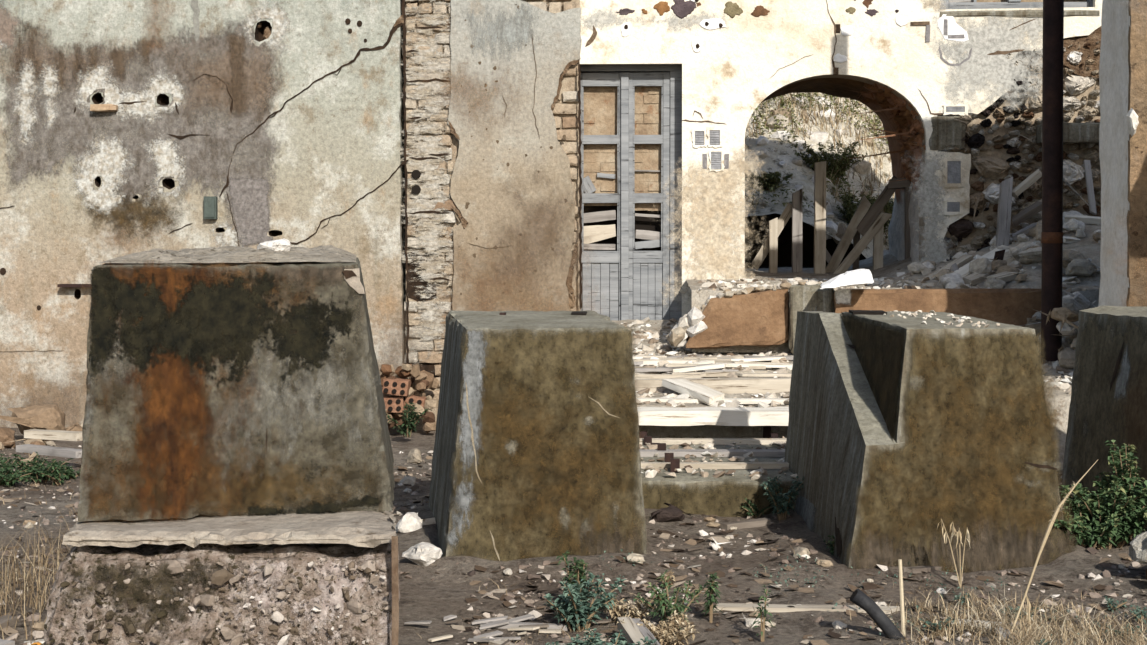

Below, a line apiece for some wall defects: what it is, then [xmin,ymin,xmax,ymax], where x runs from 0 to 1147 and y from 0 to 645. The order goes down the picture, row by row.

flaking render [616,0,701,19]
flaking render [724,1,770,18]
flaking render [845,0,878,16]
crack [193,74,233,112]
flaking render [1063,26,1102,123]
damp [0,6,281,247]
crack [168,102,210,140]
crack [219,0,409,364]
flaking render [931,49,1042,261]
flaking render [1063,143,1101,217]
corrosion [110,265,265,317]
spalling [407,251,437,302]